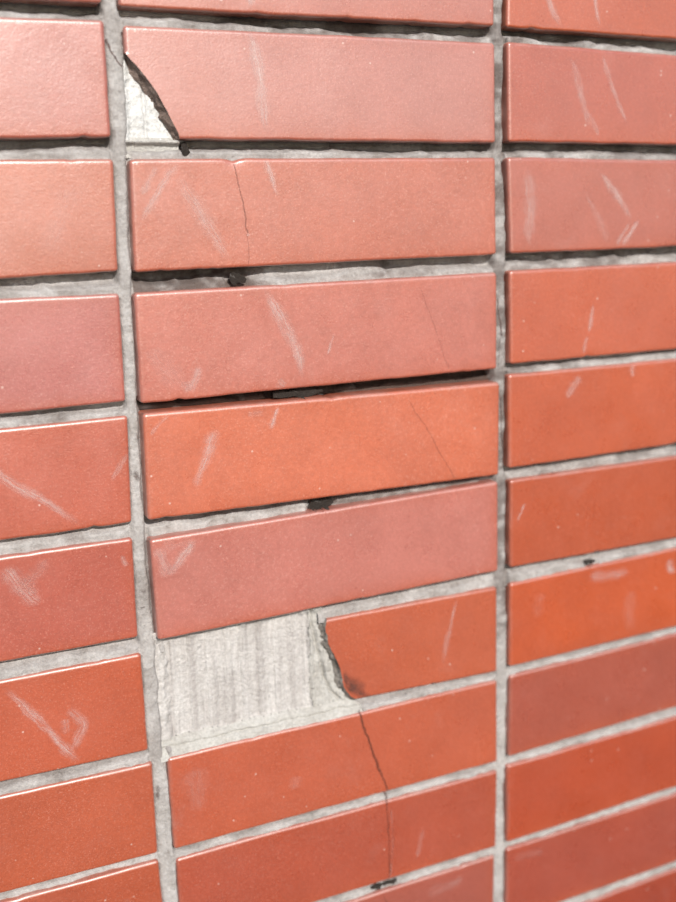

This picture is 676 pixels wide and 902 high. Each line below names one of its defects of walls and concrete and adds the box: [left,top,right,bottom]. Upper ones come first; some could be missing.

spalling [122,47,183,158]
spalling [153,606,363,763]
crack [359,712,389,825]